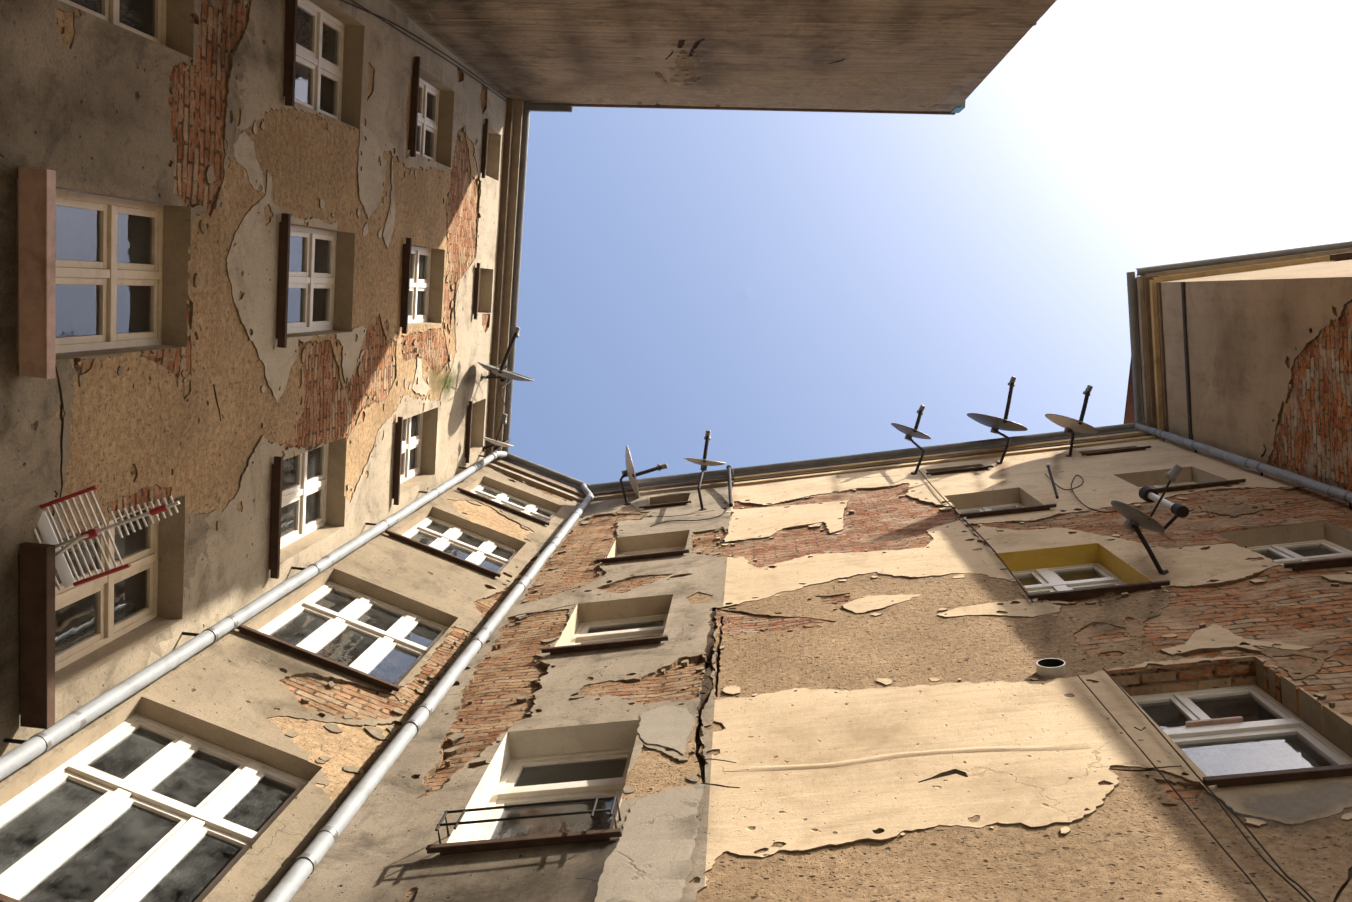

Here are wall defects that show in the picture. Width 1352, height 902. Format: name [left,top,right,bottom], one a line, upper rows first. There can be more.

flaking render [480,85,488,113]
flaking render [45,0,481,533]
flaking render [482,313,490,333]
flaking render [568,299,1352,717]
flaking render [267,497,691,809]
flaking render [621,716,725,800]
crack [694,607,740,788]
flaking render [689,765,1352,902]